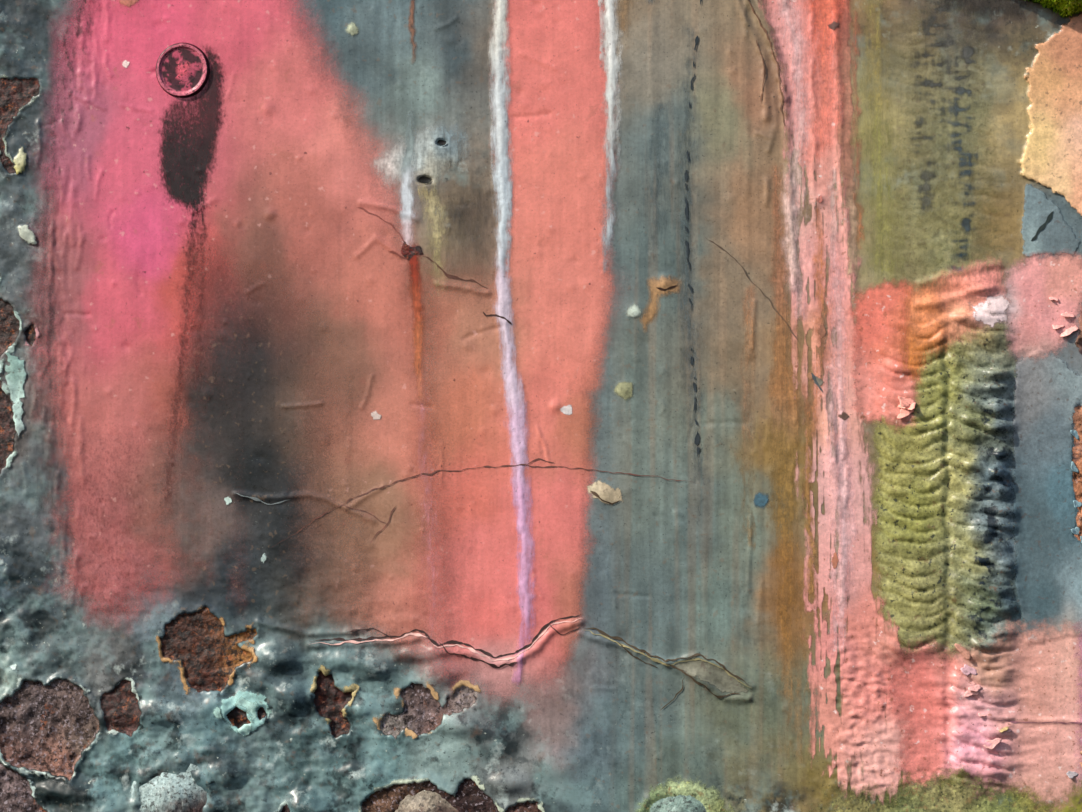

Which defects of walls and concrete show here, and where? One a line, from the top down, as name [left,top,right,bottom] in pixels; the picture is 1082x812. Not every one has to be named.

peeling [13,147,26,174]
peeling [18,225,37,244]
crack [279,0,799,543]
rust [401,241,423,399]
peeling [5,352,26,437]
crack [236,493,286,505]
peeling [220,689,268,733]
peeling [30,777,94,804]